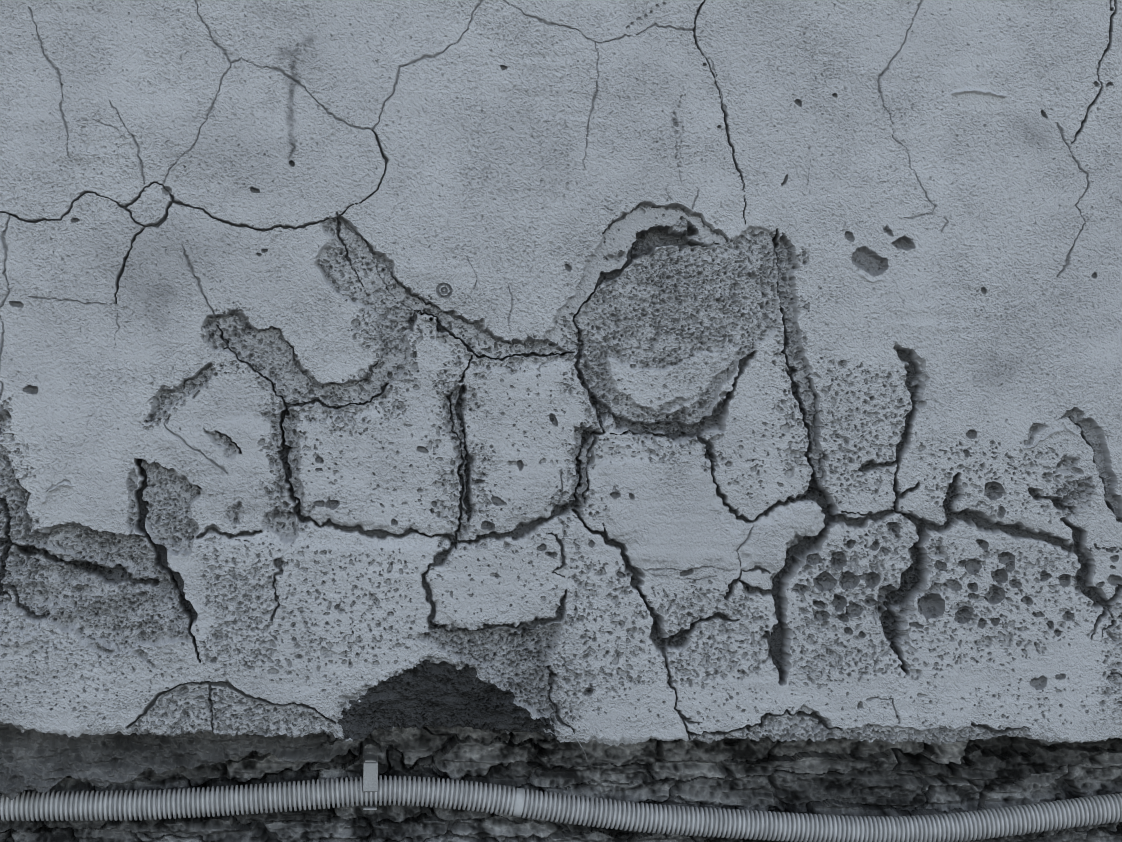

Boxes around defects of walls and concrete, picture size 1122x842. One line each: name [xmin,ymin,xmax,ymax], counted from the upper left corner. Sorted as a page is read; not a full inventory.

crack [0,0,747,411]
crack [876,0,949,234]
crack [1056,0,1118,279]
flaking render [144,201,830,551]
flaking render [0,409,202,670]
crack [133,458,201,663]
crack [195,524,263,540]
flaking render [413,589,576,735]
crack [267,343,1122,741]
flaking render [788,522,910,649]
flaking render [686,704,1033,745]
flaking render [909,538,1081,649]